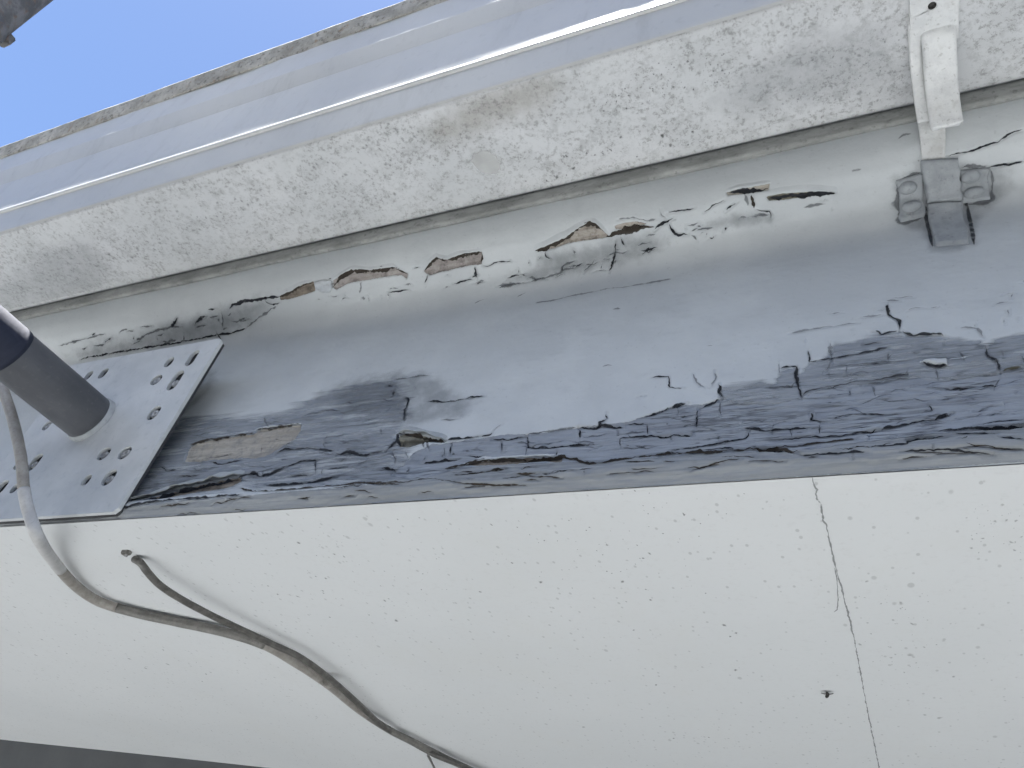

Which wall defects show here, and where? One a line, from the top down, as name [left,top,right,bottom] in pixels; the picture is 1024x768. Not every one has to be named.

peeling [726,180,838,207]
peeling [533,218,653,252]
peeling [422,248,483,275]
peeling [276,263,408,300]
peeling [40,335,1024,524]
crack [124,305,1023,768]